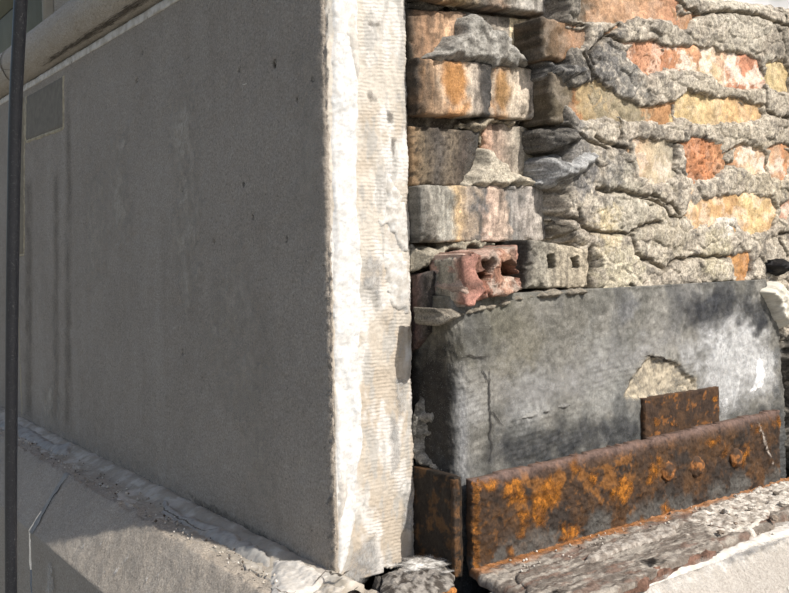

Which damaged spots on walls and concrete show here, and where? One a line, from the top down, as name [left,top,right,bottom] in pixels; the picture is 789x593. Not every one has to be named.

spalling [429,240,588,307]
crack [465,354,501,461]
spalling [624,356,697,398]
leakage [682,318,775,406]
peeling [737,358,765,393]
corrosion [443,479,461,593]
corrosion [471,479,615,568]
corrosion [515,503,723,593]
corrosion [612,476,633,503]